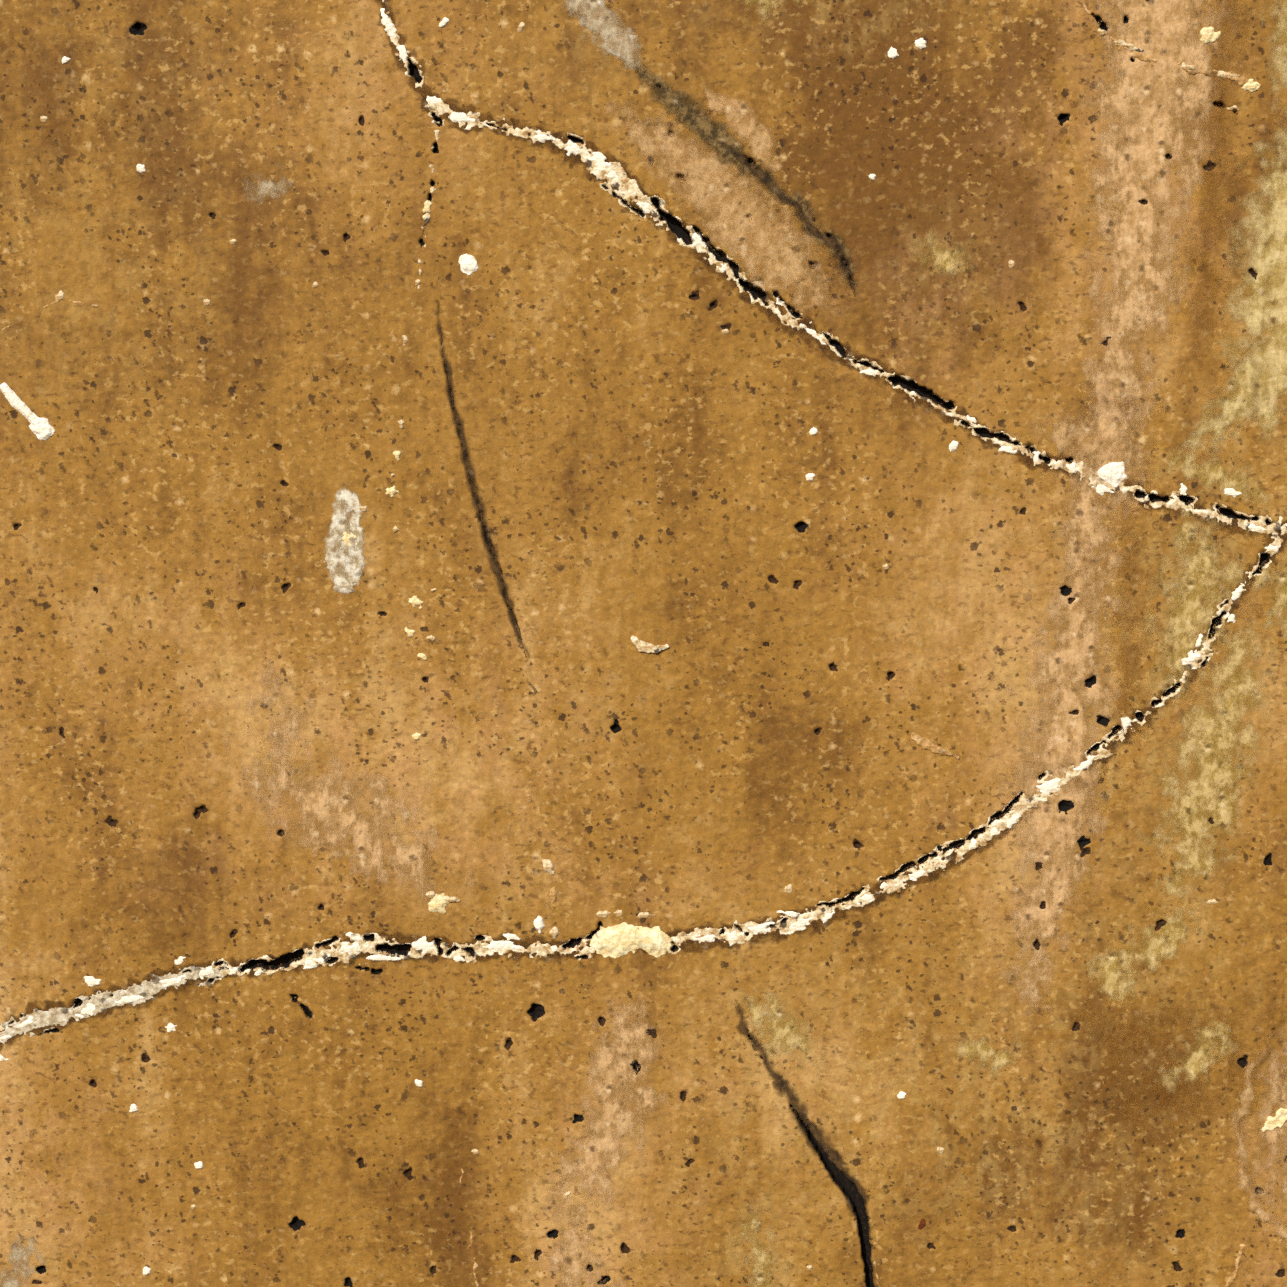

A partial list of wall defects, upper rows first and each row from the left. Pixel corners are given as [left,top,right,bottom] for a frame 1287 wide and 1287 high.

water stain [1275,22,1287,83]
crack [43,298,98,308]
crack [438,304,527,658]
crack [376,0,1287,539]
water stain [1169,135,1287,499]
crack [0,530,1287,1049]
water stain [1158,508,1287,895]
crack [737,1007,880,1287]
crack [1224,1244,1246,1287]